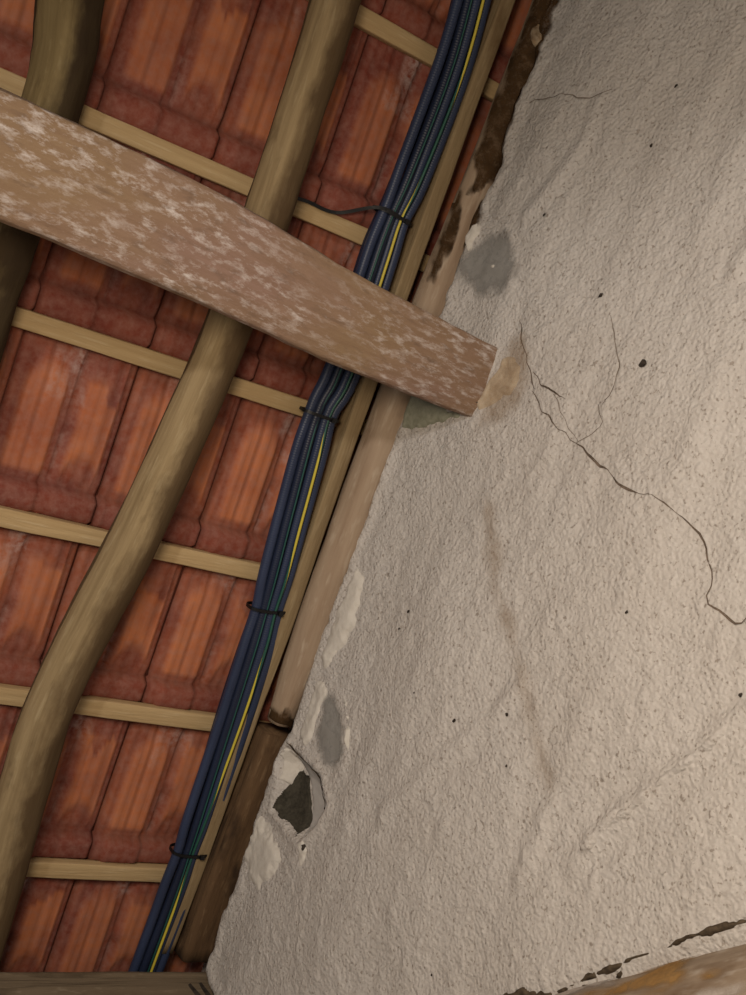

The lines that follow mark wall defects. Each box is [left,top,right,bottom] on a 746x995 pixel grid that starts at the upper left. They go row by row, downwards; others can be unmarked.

damp [430,0,559,281]
crack [520,315,746,625]
damp [268,708,293,727]
flaking render [272,681,350,866]
peeling [604,959,684,995]